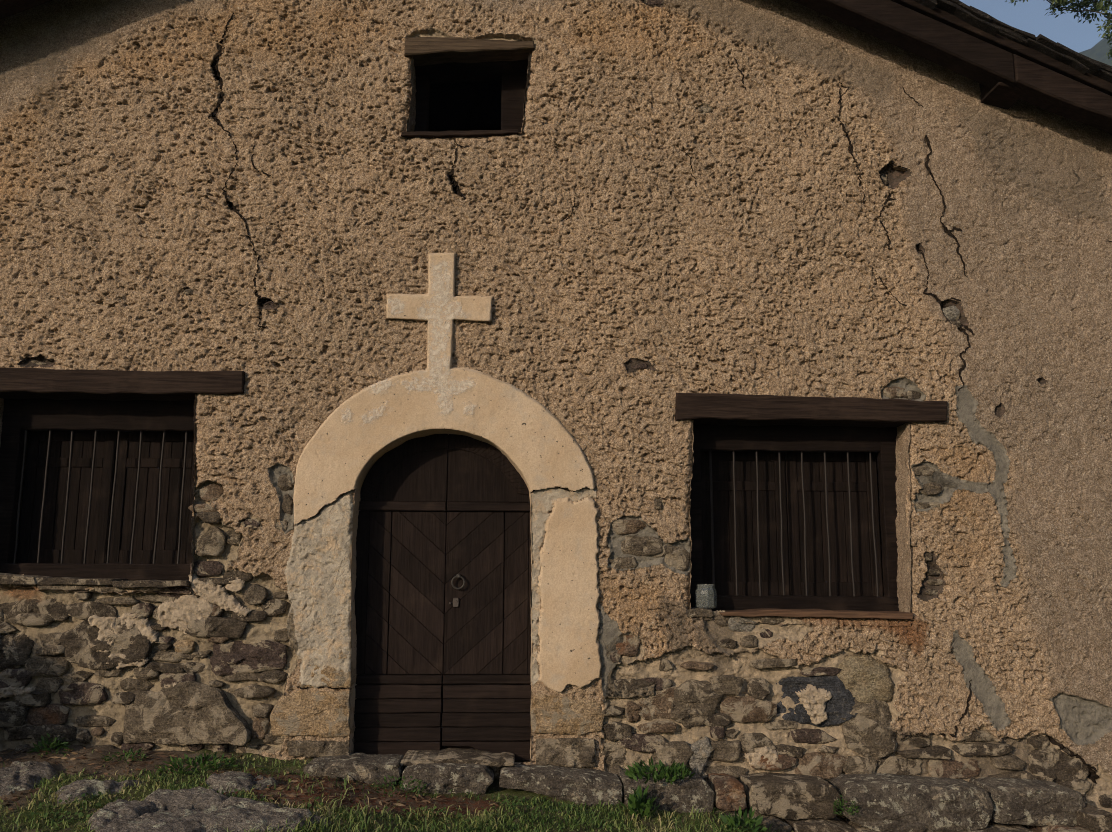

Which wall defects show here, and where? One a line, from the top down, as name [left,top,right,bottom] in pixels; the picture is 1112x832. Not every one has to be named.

crack [208,13,273,328]
crack [449,139,471,199]
flaking render [879,161,911,189]
crack [836,77,974,391]
flaking render [995,403,1006,417]
flaking render [654,497,664,512]
flaking render [911,460,959,512]
flaking render [607,515,691,575]
flaking render [917,551,946,601]
flaking render [0,462,353,754]
flaking render [599,610,1112,813]